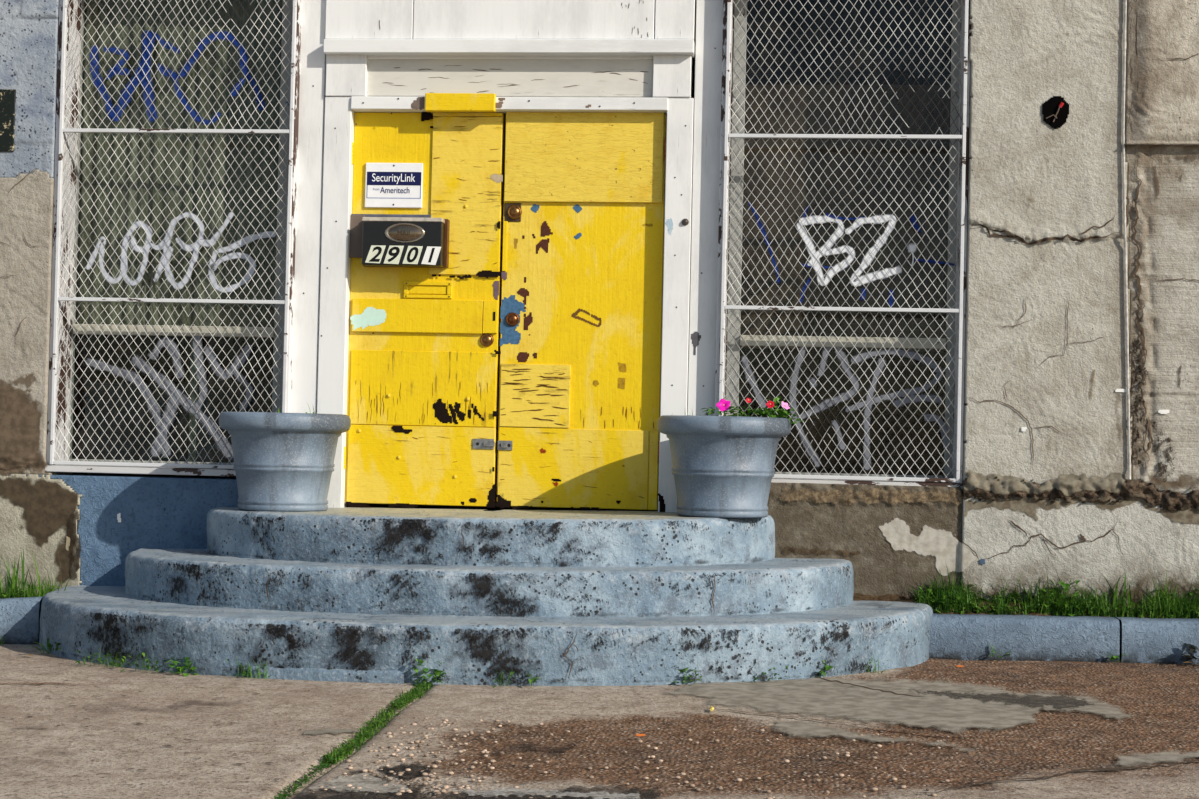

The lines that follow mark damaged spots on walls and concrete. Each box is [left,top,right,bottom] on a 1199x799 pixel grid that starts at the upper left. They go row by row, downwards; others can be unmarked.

crack [967,0,1199,478]
spalling [66,511,81,579]
peeling [879,518,985,576]
crack [959,520,1124,561]
leakage [60,514,850,685]
leakage [784,617,902,680]